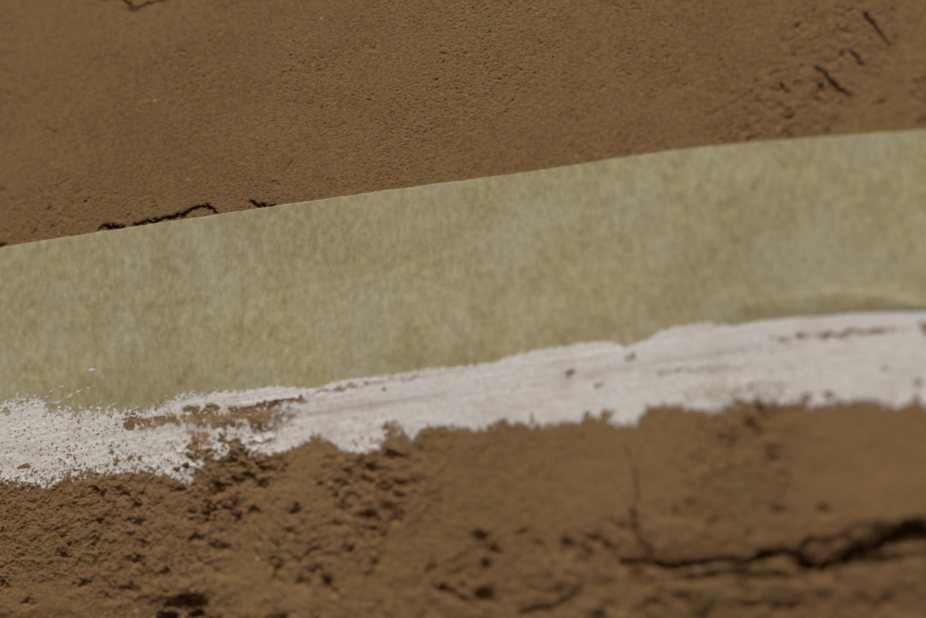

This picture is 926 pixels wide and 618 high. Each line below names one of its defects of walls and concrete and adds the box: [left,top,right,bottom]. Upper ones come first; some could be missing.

crack [103,0,167,12]
crack [98,202,219,231]
crack [249,199,276,208]
spalling [0,366,926,618]
crack [620,445,926,581]